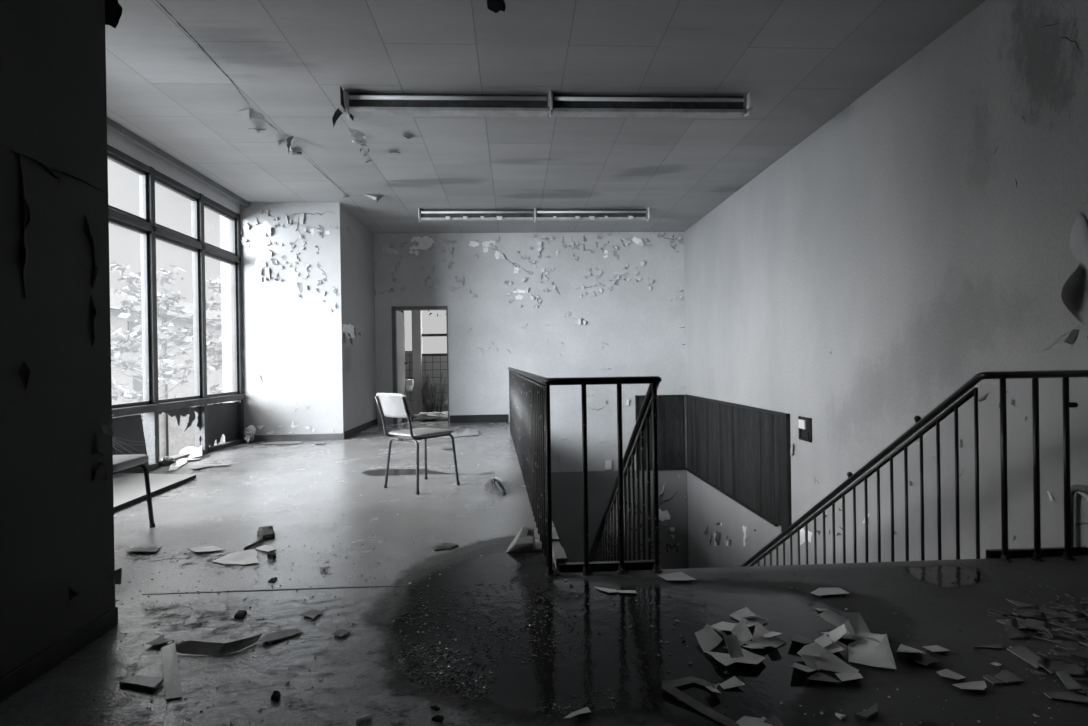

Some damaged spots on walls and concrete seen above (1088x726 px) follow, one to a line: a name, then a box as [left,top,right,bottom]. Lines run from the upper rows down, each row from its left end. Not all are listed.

peeling [156,0,346,198]
peeling [348,128,370,163]
peeling [240,209,338,312]
peeling [402,235,542,309]
peeling [1041,327,1088,359]
leakage [513,551,590,602]